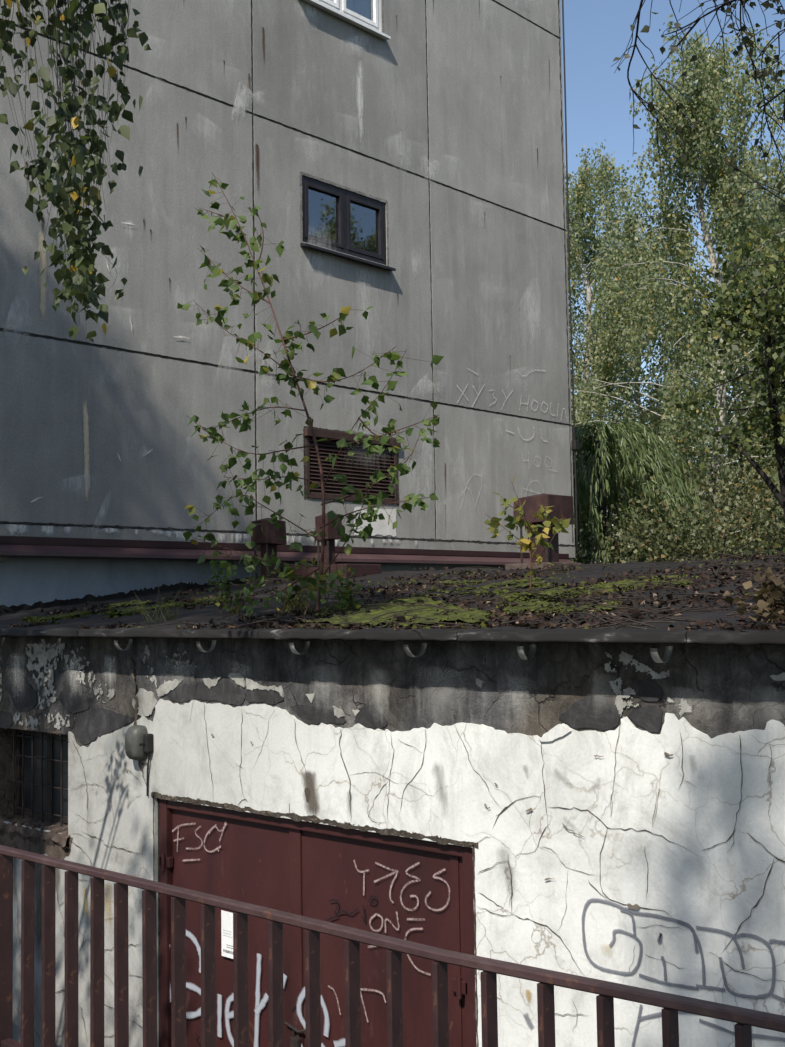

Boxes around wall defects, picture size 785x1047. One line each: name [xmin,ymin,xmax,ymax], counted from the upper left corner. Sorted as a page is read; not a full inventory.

crack [69,743,147,881]
crack [128,652,138,725]
crack [204,705,306,805]
peeling [0,636,785,747]
crack [339,724,785,1004]
crack [55,895,143,1040]